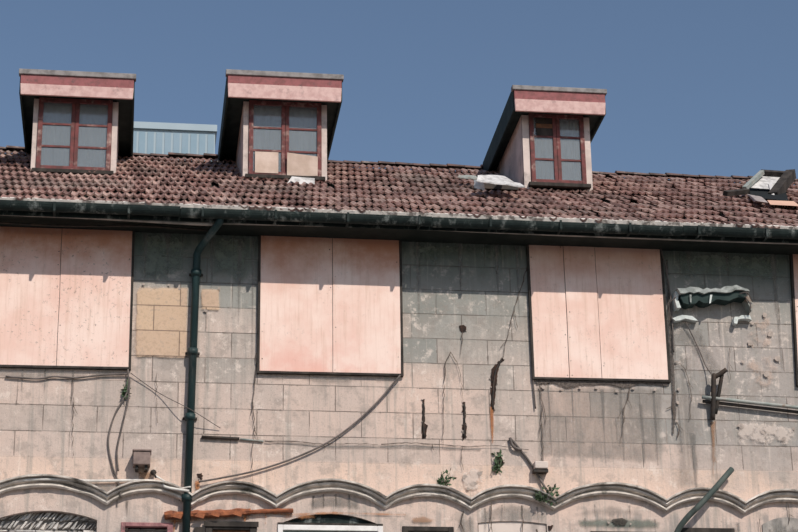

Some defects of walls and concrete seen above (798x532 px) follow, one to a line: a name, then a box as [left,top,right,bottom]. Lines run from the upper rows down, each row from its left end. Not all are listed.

flaking render [737,423,796,444]